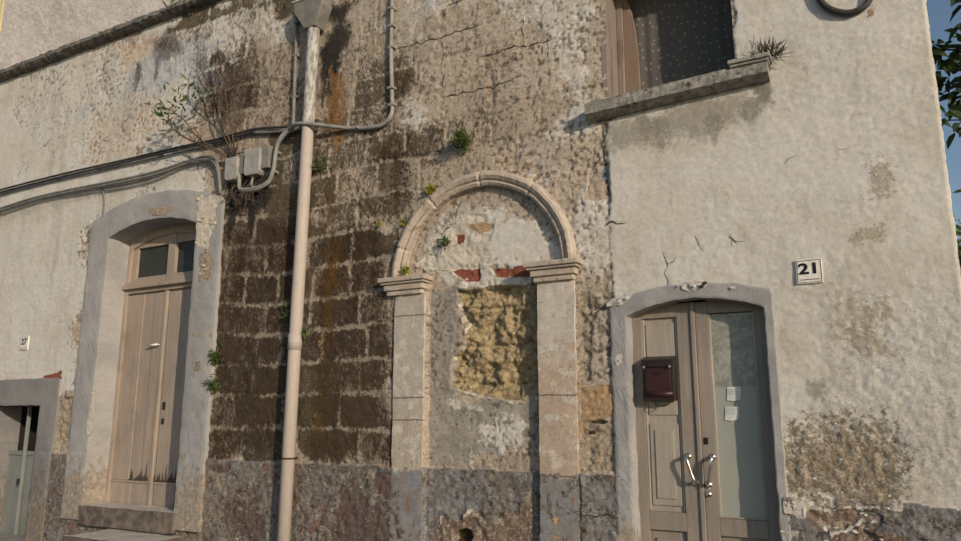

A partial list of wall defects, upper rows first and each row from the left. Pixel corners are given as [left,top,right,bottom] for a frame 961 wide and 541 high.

crack [397,25,522,98]
crack [478,20,554,58]
peeling [866,155,898,200]
peeling [195,194,219,281]
peeling [848,221,886,247]
spalling [414,217,539,404]
spalling [783,399,924,541]
peeling [429,497,562,541]